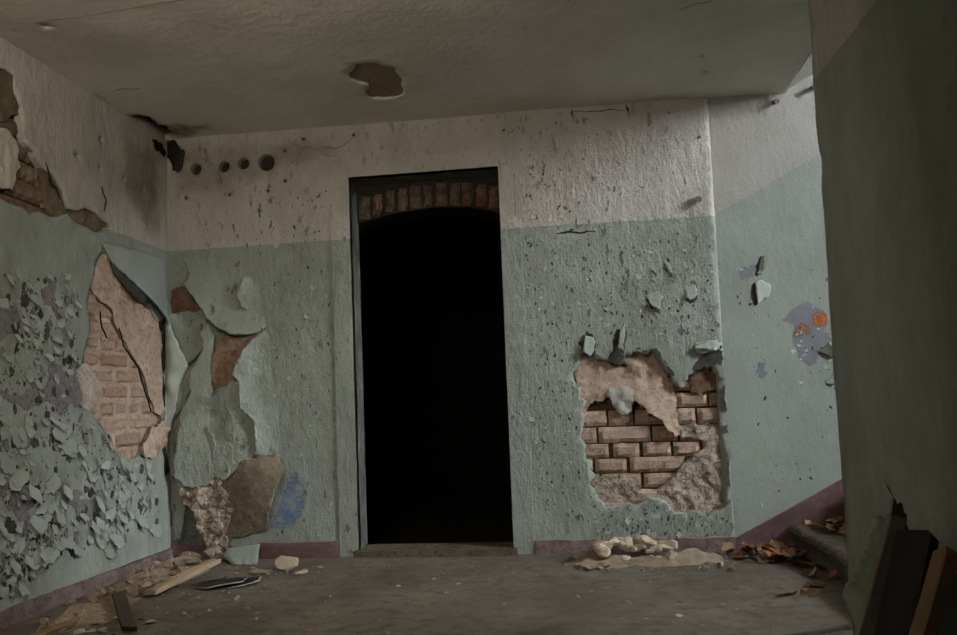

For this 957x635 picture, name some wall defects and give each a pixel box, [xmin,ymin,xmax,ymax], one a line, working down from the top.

spalling [349,62,403,97]
peeling [736,255,771,314]
peeling [0,69,330,603]
flaking render [525,231,736,539]
peeling [778,295,835,389]